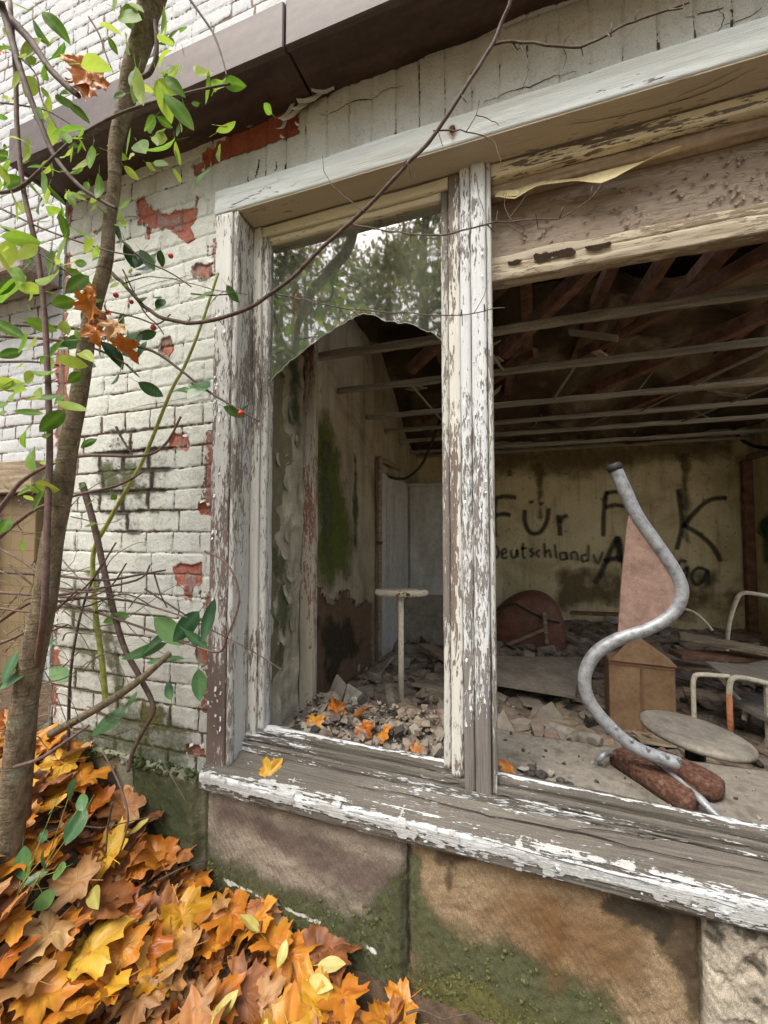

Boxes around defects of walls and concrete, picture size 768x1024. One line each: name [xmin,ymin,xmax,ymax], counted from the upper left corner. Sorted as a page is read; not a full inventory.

crack [689,7,762,32]
spalling [190,86,334,176]
crack [321,86,401,122]
crack [484,35,576,102]
crack [568,68,756,126]
peeling [495,146,681,199]
spalling [136,195,199,244]
spalling [82,427,191,540]
spalling [172,562,203,601]
damp [437,851,470,888]
peeling [200,767,768,945]
damp [602,897,702,1020]